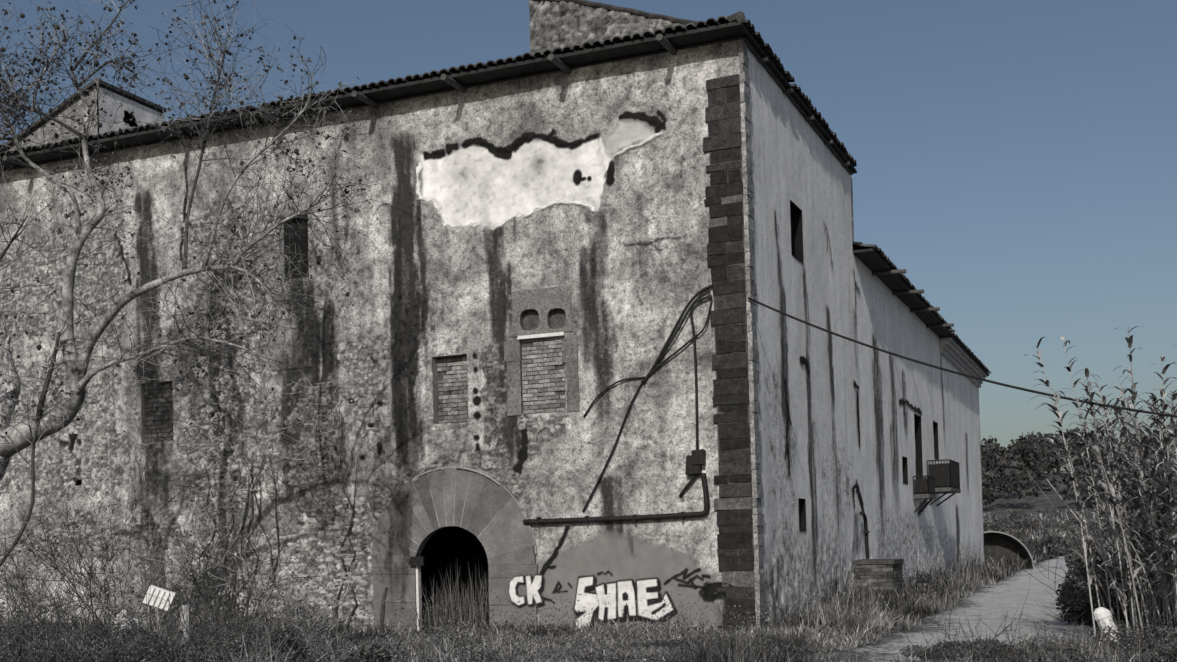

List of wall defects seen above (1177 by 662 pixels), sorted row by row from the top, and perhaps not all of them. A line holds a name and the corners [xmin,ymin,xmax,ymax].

leakage [135,192,162,392]
flaking render [0,193,566,632]
leakage [389,136,428,471]
leakage [484,217,520,464]
spalling [416,119,662,230]
leakage [580,212,616,415]
leakage [774,211,790,449]
leakage [803,268,818,580]
leakage [826,307,839,526]
leakage [872,335,908,523]